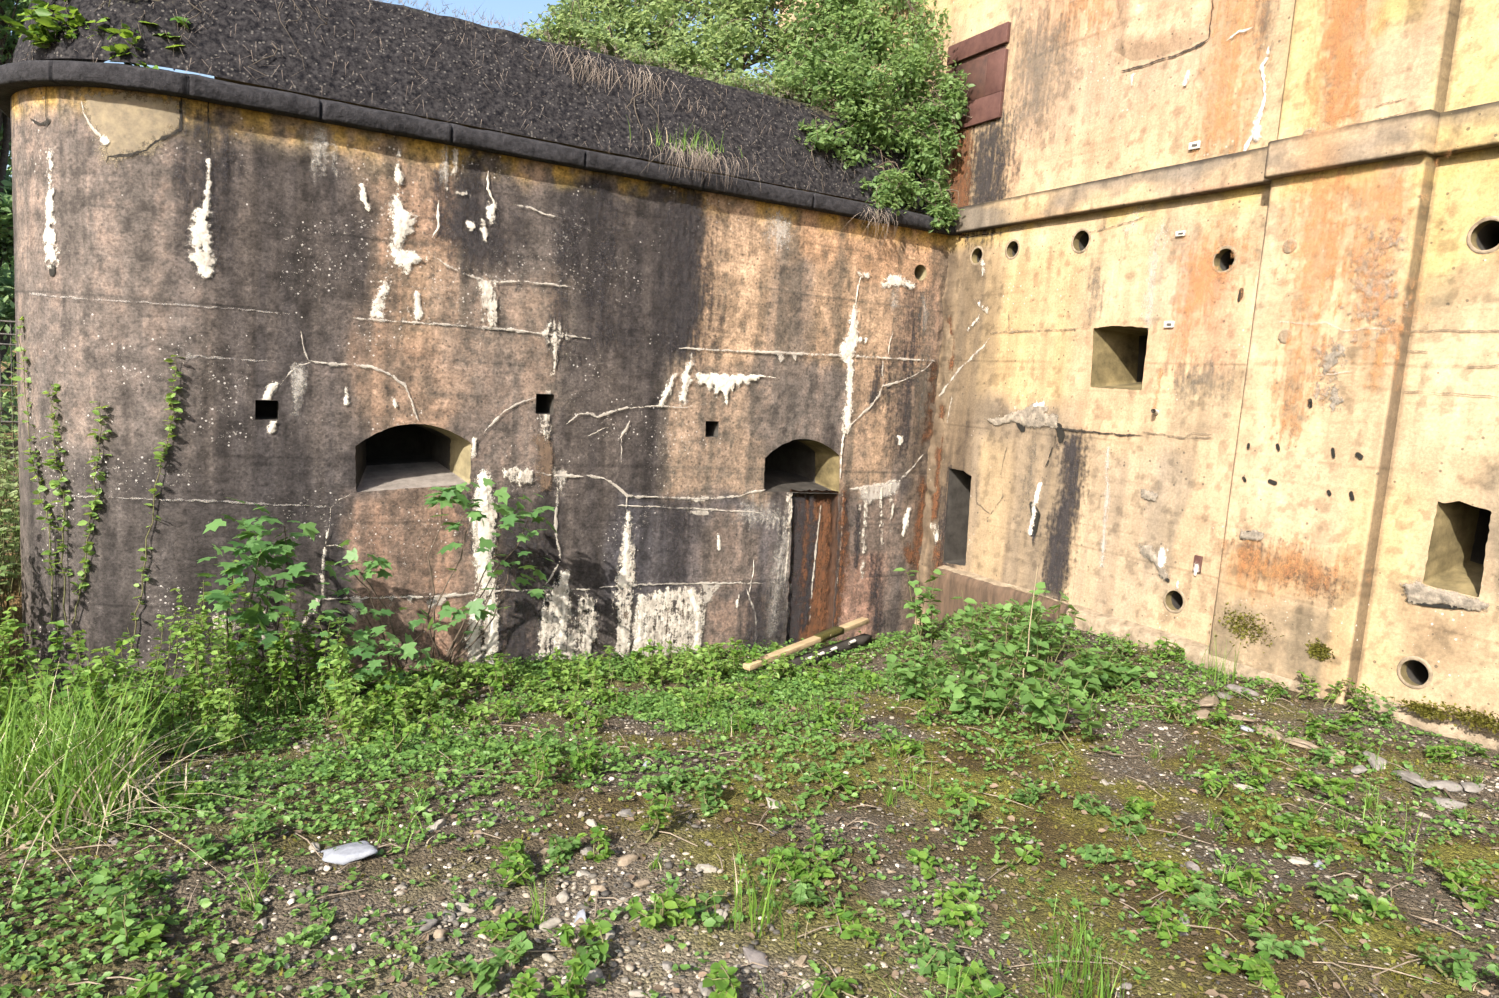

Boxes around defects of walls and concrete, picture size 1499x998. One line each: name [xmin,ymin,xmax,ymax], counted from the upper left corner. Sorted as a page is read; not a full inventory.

crack [1116,0,1214,71]
water stain [1243,46,1269,151]
corrosion [1322,0,1378,130]
water stain [173,104,240,278]
corrosion [1281,168,1411,430]
water stain [459,414,706,665]
water stain [736,493,793,649]
corrosion [774,490,850,644]
water stain [1028,433,1109,601]